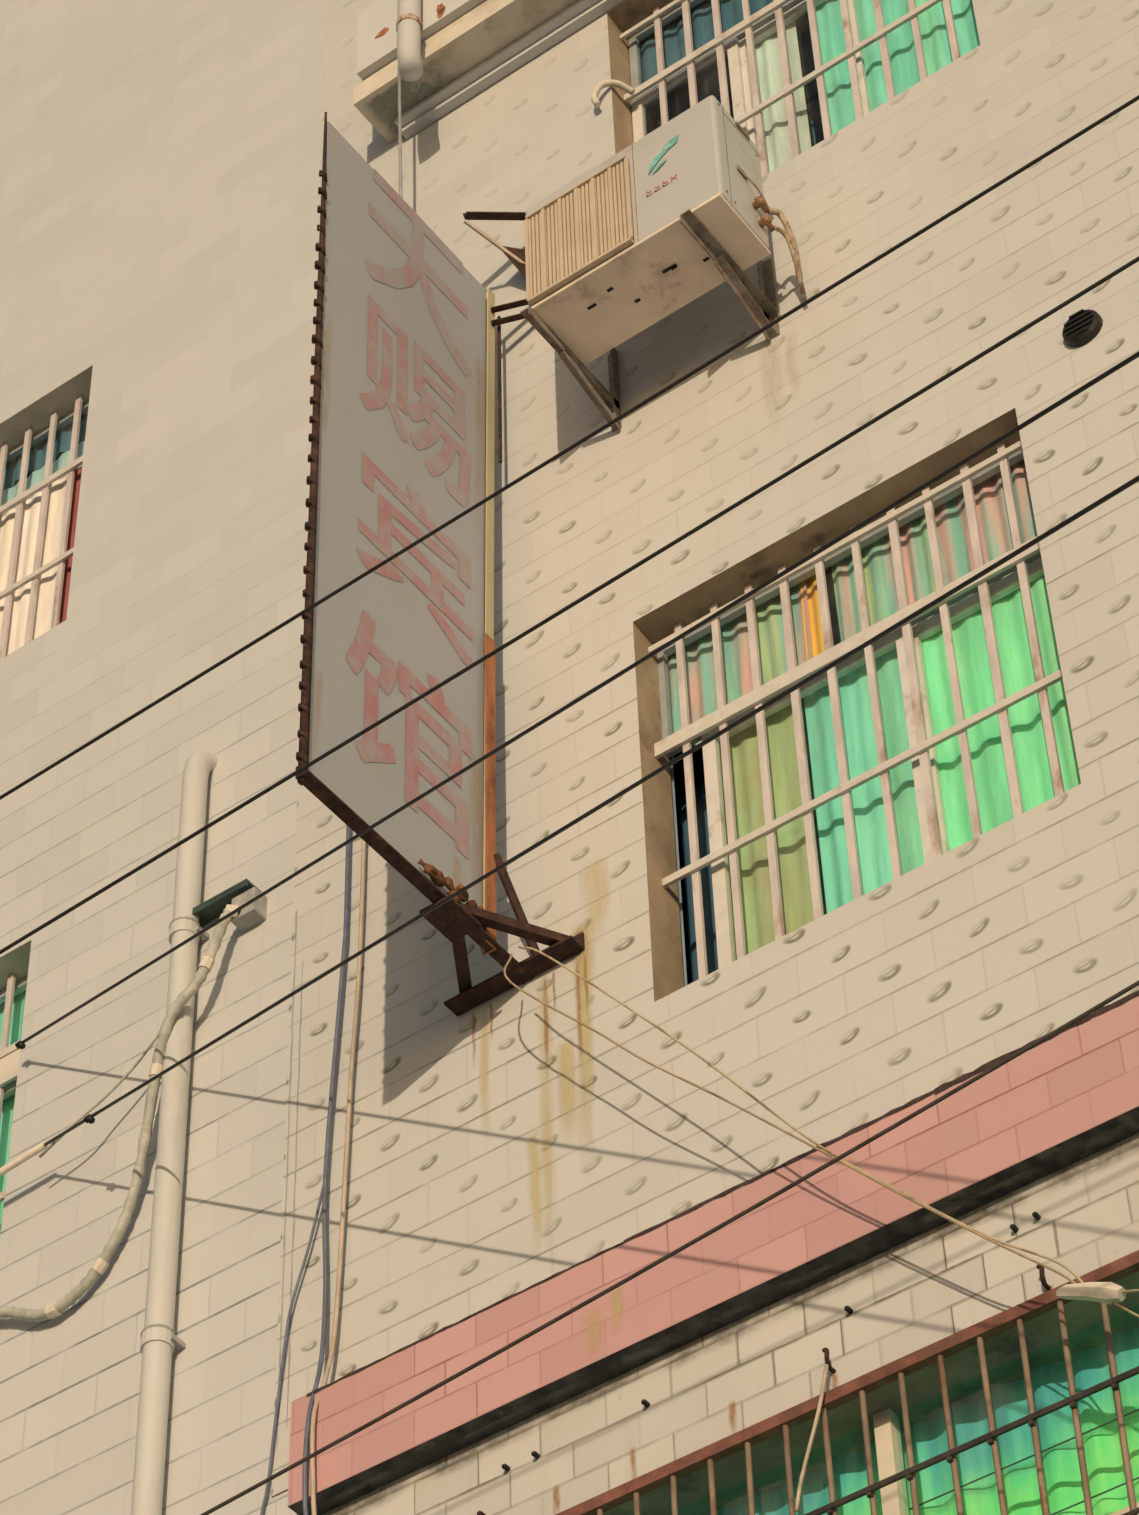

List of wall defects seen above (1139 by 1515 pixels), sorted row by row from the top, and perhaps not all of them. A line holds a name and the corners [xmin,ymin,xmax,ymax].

rust [544,963,589,1104]